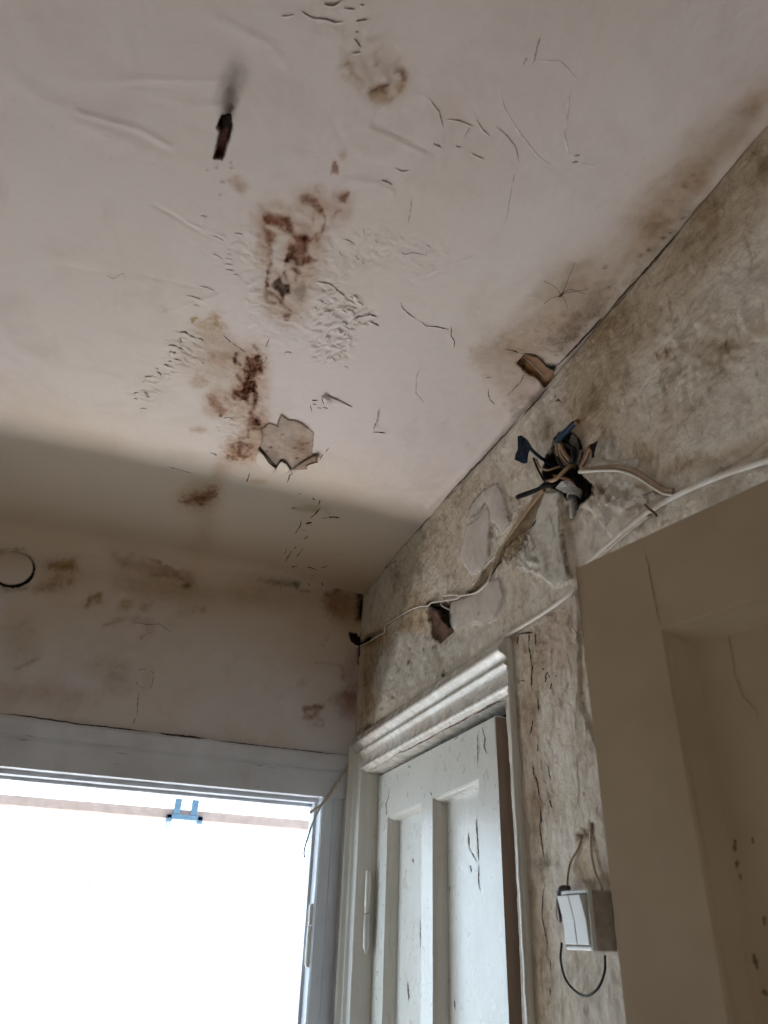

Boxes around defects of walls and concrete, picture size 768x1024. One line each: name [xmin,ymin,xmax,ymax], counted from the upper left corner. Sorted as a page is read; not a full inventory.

crack [558,133,760,365]
spalling [517,351,556,387]
peeling [256,415,318,474]
crack [385,349,561,569]
crack [284,472,340,586]
spalling [375,601,478,696]
crack [517,632,598,855]
crack [542,887,551,995]